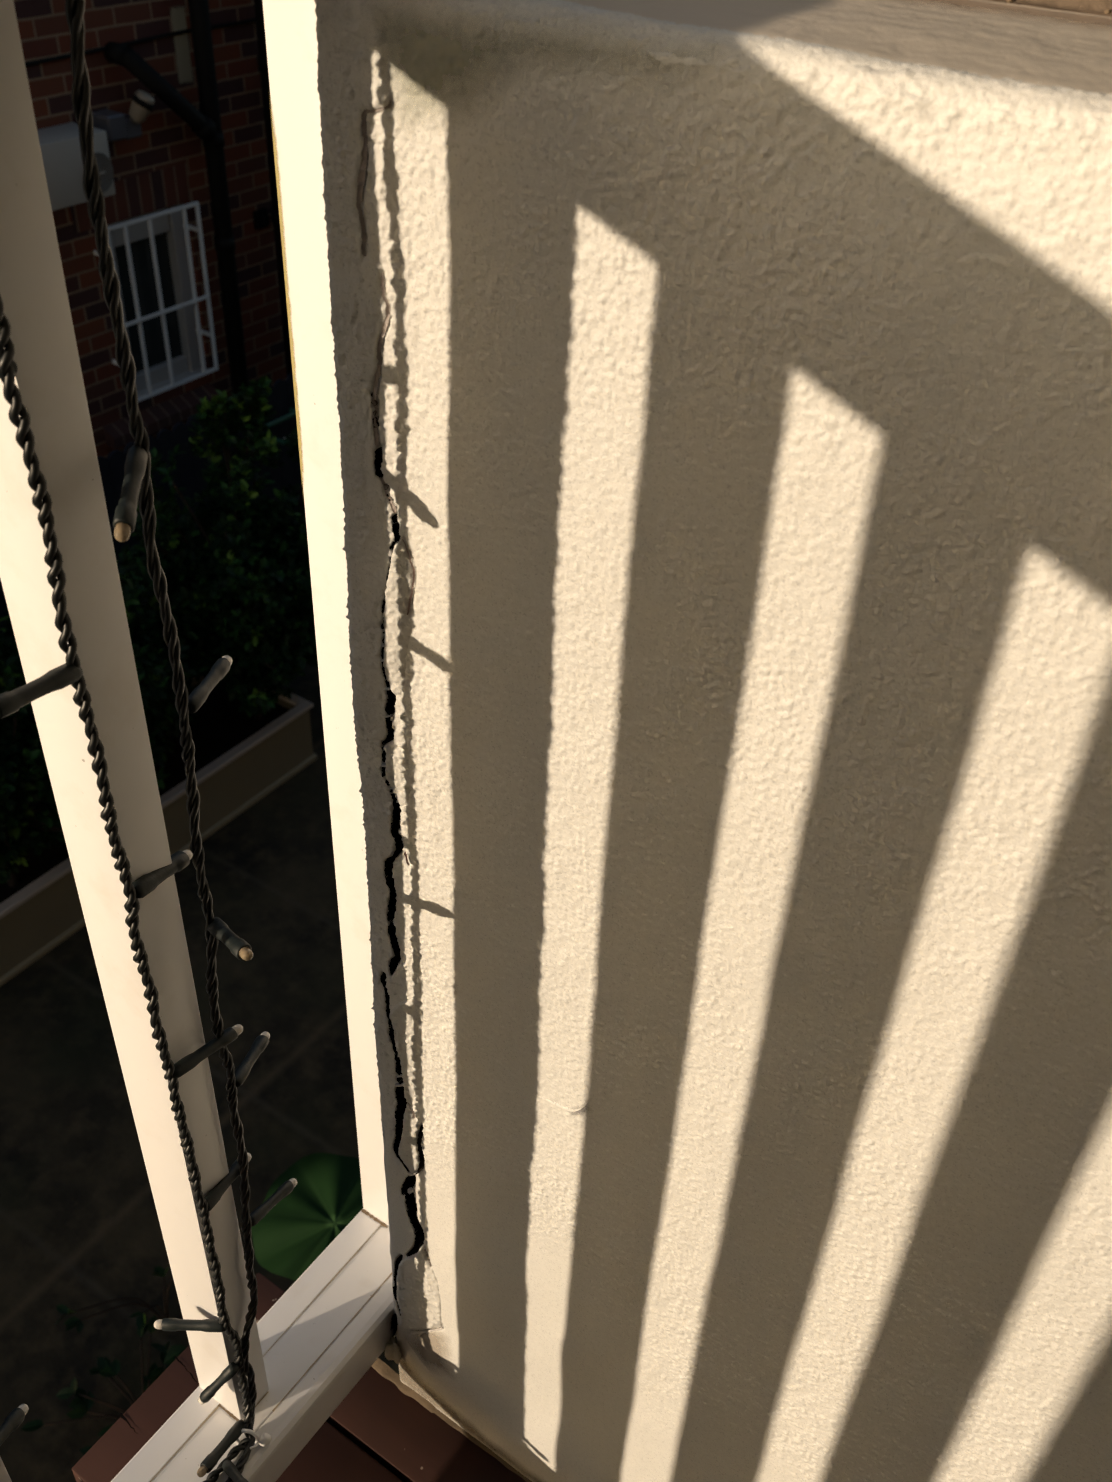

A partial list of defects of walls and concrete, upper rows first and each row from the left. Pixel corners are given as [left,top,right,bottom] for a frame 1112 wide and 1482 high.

crack [356,100,431,1336]